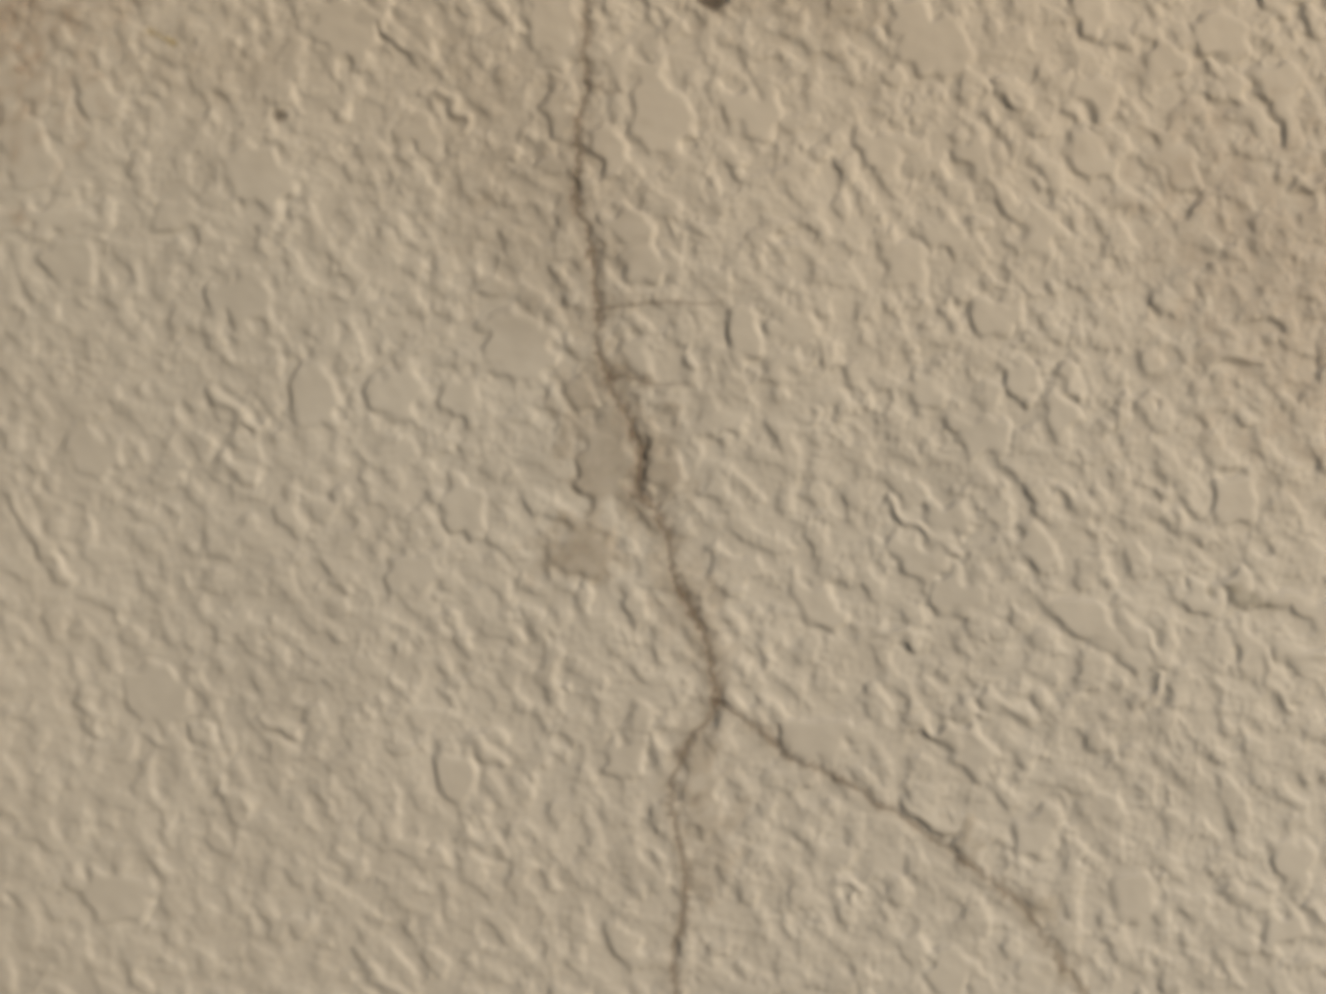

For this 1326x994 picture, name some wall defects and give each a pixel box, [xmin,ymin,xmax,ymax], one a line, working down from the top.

crack [572,112,600,312]
crack [629,419,663,517]
crack [671,567,707,643]